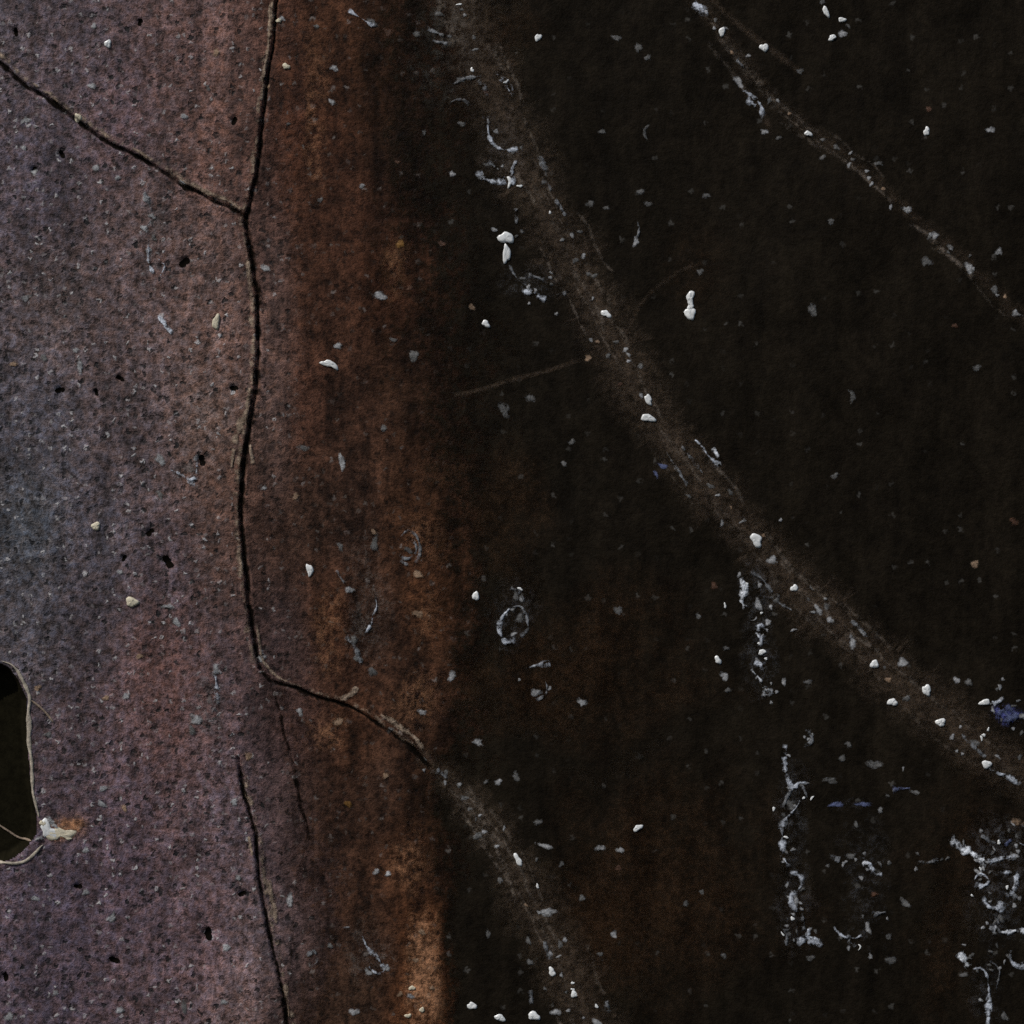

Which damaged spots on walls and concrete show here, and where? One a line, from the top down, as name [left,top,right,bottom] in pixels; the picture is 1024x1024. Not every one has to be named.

spalling [0,661,83,865]
crack [0,0,429,857]
crack [239,769,294,1024]
corrosion [236,0,493,1024]
water stain [347,0,1024,1024]